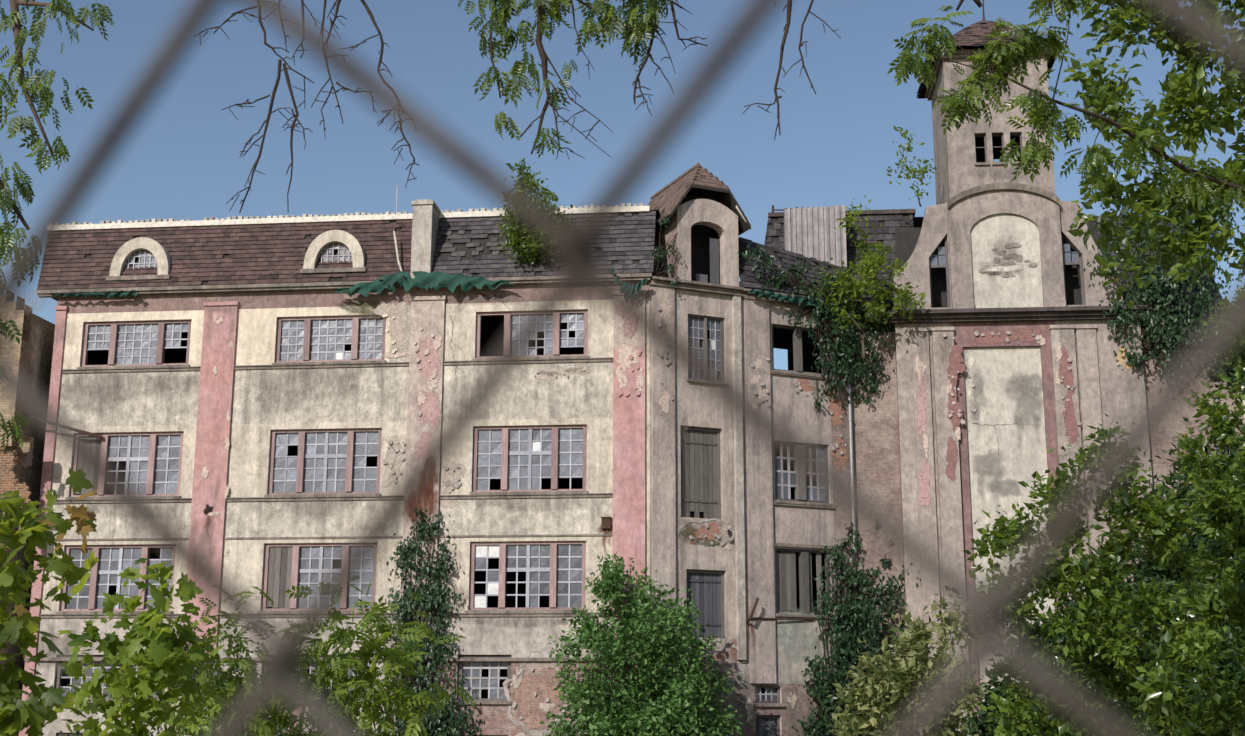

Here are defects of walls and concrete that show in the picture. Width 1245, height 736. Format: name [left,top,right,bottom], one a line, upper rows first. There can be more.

peeling [656,297,673,325]
peeling [615,322,671,396]
peeling [659,381,674,414]
damp [971,374,983,415]
peeling [942,328,1081,483]
damp [1007,375,1043,424]
peeling [915,354,931,511]
damp [975,453,1019,495]
flaking render [676,518,735,550]
flaking render [502,646,571,736]